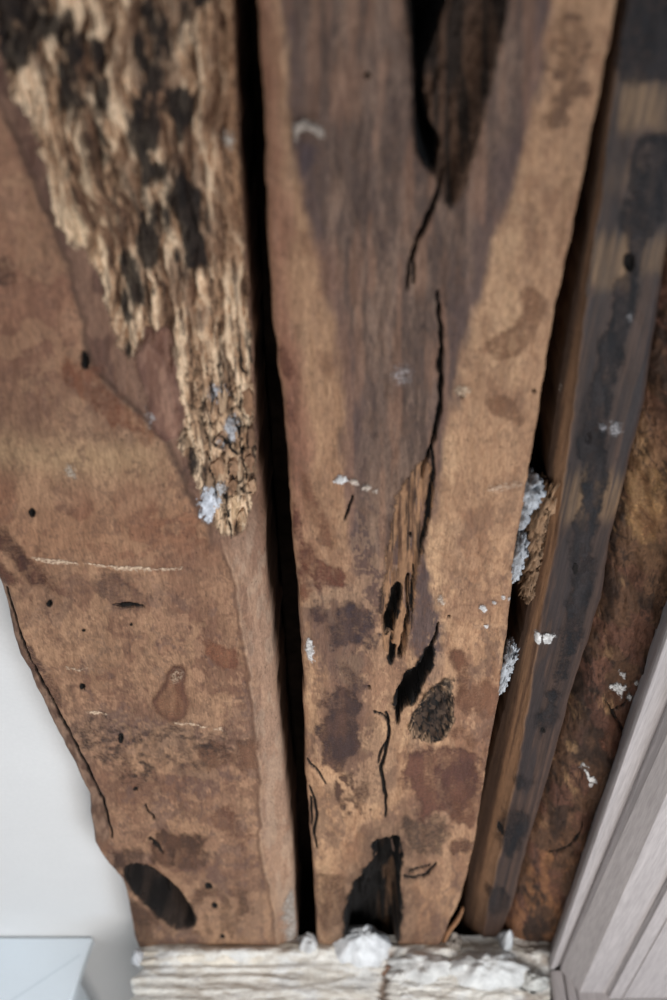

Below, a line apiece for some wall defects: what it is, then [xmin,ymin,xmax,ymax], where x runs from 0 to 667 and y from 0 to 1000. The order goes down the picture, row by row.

crack [406,169,443,552]
damp [314,595,386,651]
damp [315,668,371,815]
crack [374,711,390,815]
damp [400,730,487,855]
damp [130,902,158,946]